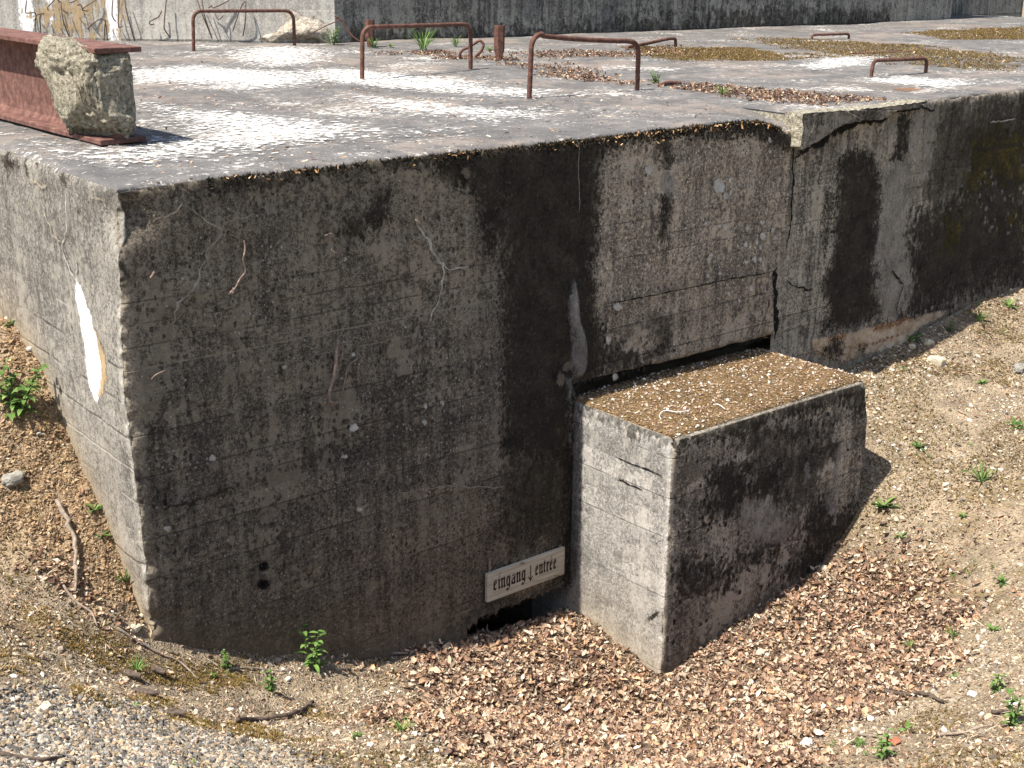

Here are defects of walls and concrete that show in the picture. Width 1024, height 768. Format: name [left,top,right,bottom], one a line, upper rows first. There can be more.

corrosion [20,0,129,41]
damp [475,132,679,592]
crack [230,15,1024,370]
damp [666,411,859,610]